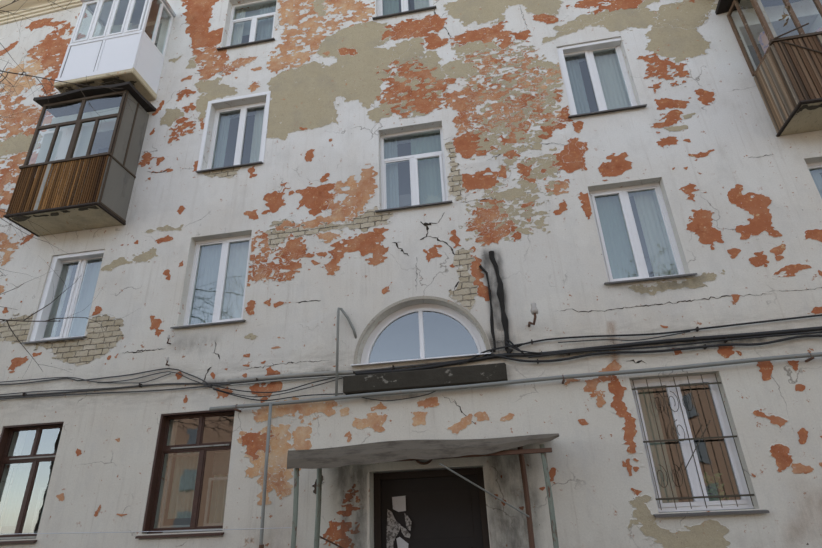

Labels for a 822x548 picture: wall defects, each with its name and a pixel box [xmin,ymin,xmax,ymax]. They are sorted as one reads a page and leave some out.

peeling [0,9,88,220]
flaking render [150,0,726,316]
peeling [0,227,34,267]
flaking render [0,278,125,374]
peeling [149,313,165,338]
crack [393,213,459,290]
crack [561,287,822,312]
peeling [678,183,822,280]
peeling [234,353,389,506]
peeling [557,360,646,476]
peeling [319,481,367,548]
flaking render [626,488,731,548]